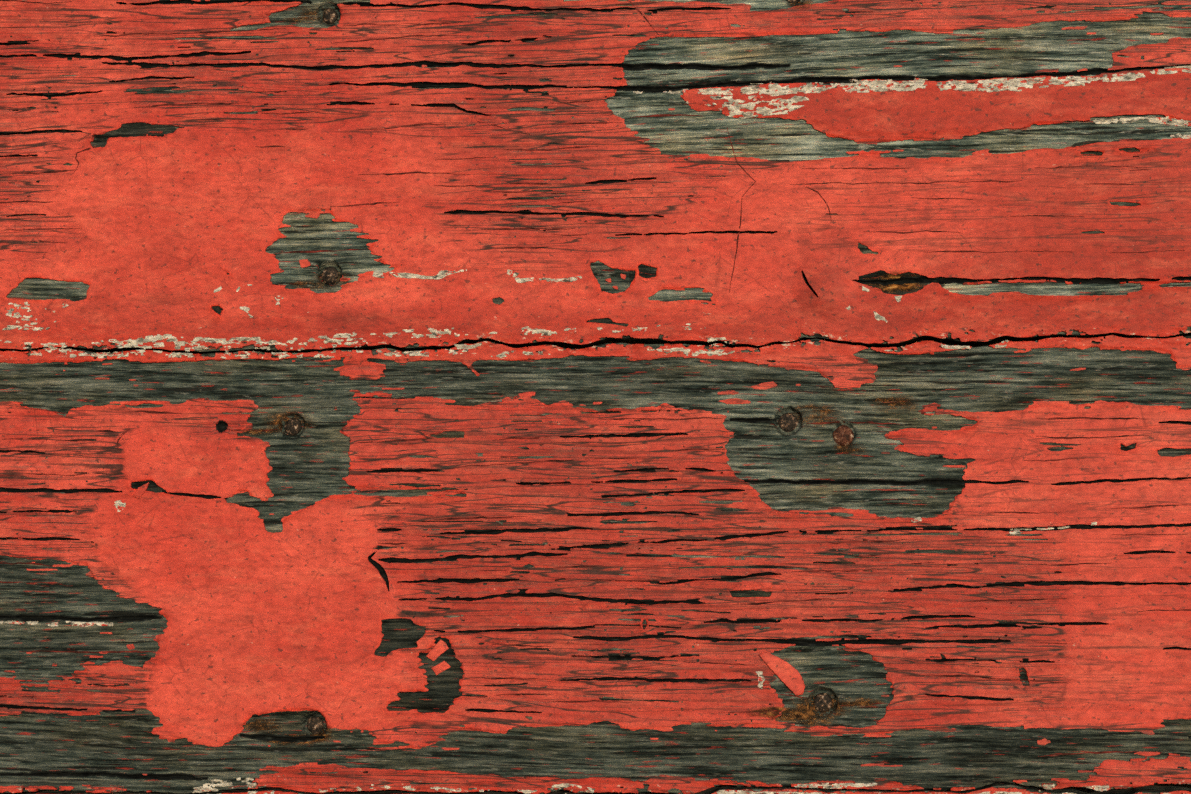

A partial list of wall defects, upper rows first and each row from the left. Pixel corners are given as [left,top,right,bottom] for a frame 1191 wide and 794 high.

peeling [91,122,184,148]
peeling [224,0,371,40]
crack [0,0,1191,293]
peeling [605,5,1191,167]
peeling [266,209,467,305]
crack [802,271,818,297]
peeling [0,323,1191,533]
peeling [0,555,168,689]
peeling [375,616,472,713]
peeling [0,636,1191,794]
crack [348,417,1191,714]
rust [752,699,879,725]